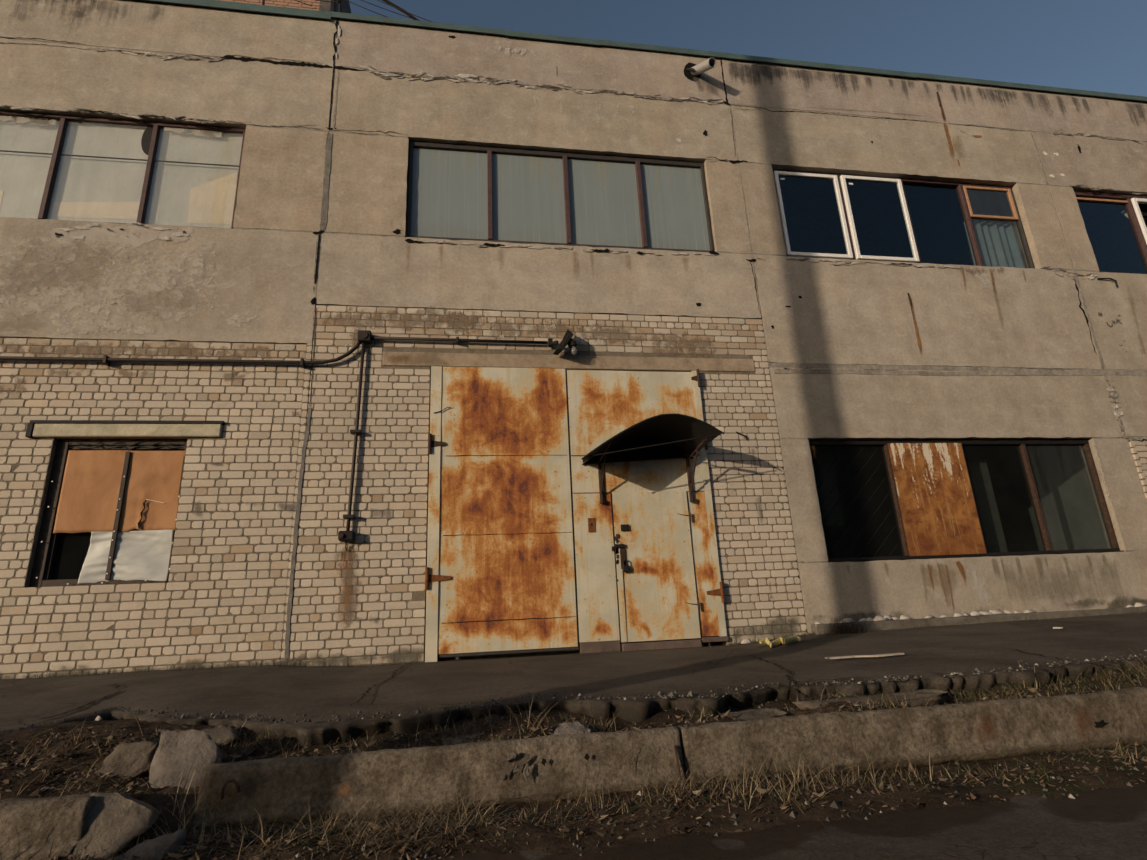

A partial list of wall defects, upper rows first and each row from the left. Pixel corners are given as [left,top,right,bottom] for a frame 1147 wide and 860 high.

crack [0,36,136,53]
crack [330,18,341,64]
crack [249,124,405,136]
spalling [48,222,193,248]
spalling [392,229,719,256]
rust [887,443,986,608]
rust [340,546,357,625]
damp [1078,586,1147,608]